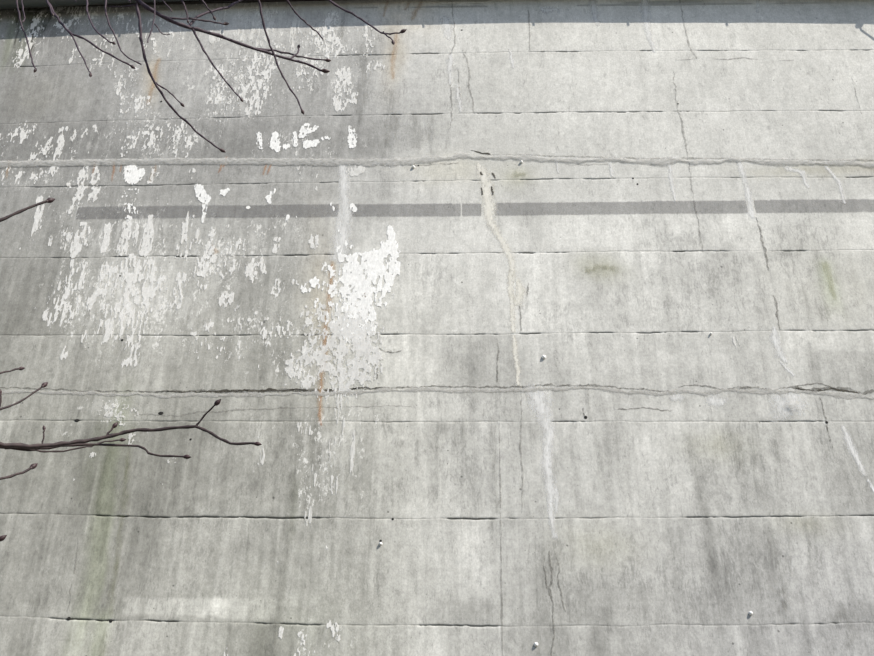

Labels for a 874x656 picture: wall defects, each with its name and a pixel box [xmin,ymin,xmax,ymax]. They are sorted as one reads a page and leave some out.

peeling [0,2,385,367]
damp [476,163,526,385]
crack [1,355,874,448]
damp [528,387,559,538]
damp [841,426,874,491]